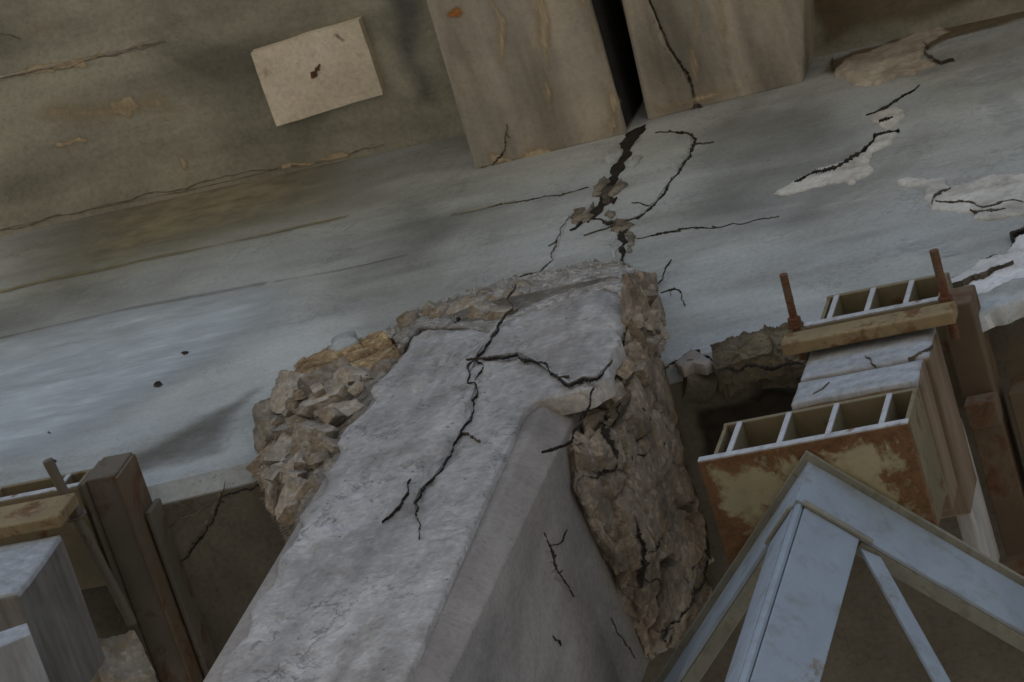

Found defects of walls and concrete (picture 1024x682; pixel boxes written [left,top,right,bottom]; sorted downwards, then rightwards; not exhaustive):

spalling [773,26,955,196]
spalling [245,258,639,544]
crack [382,0,779,633]
spalling [891,174,1024,332]
crack [170,480,260,561]